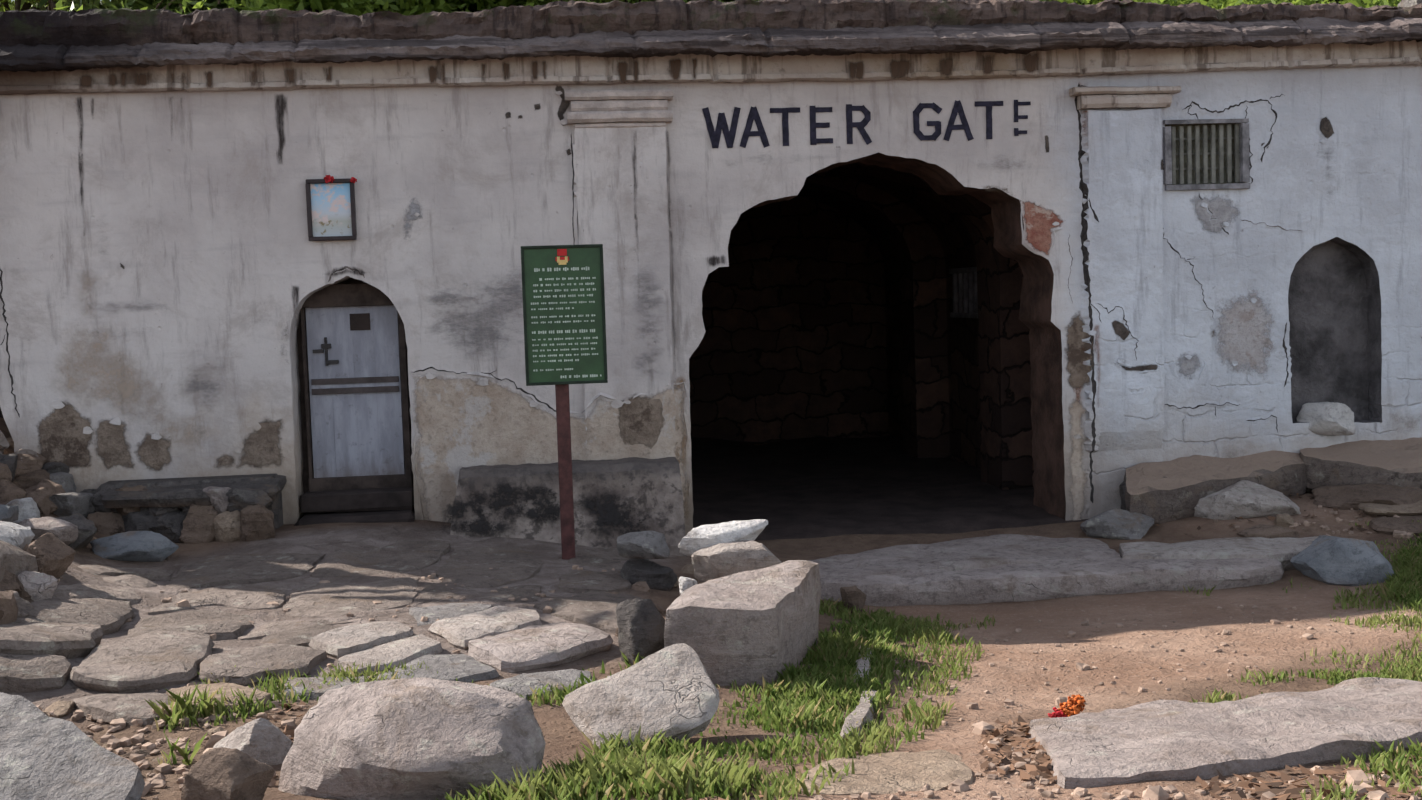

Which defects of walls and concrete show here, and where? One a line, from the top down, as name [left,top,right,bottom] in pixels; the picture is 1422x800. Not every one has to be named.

leakage [205,71,213,88]
leakage [275,69,296,160]
crack [1181,92,1303,237]
crack [0,259,23,418]
spalling [1020,200,1066,257]
spalling [1065,314,1096,388]
crack [1065,83,1141,503]
crack [1163,227,1215,320]
flaking render [38,400,171,471]
flaking render [217,420,282,468]
flaking render [410,372,690,527]
mould [444,483,650,536]